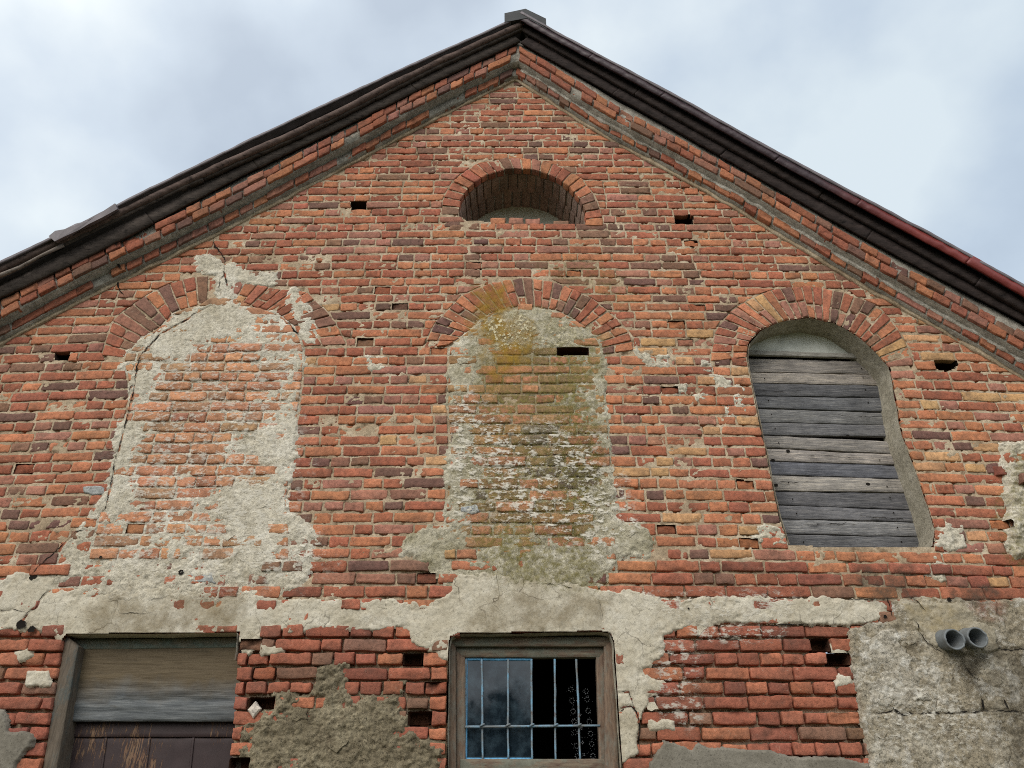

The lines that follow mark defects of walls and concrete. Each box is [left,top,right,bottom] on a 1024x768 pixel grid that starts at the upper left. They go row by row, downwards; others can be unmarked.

crack [1,310,201,620]
peeling [0,300,888,768]
water stain [451,392,637,553]
spalling [989,520,1010,530]